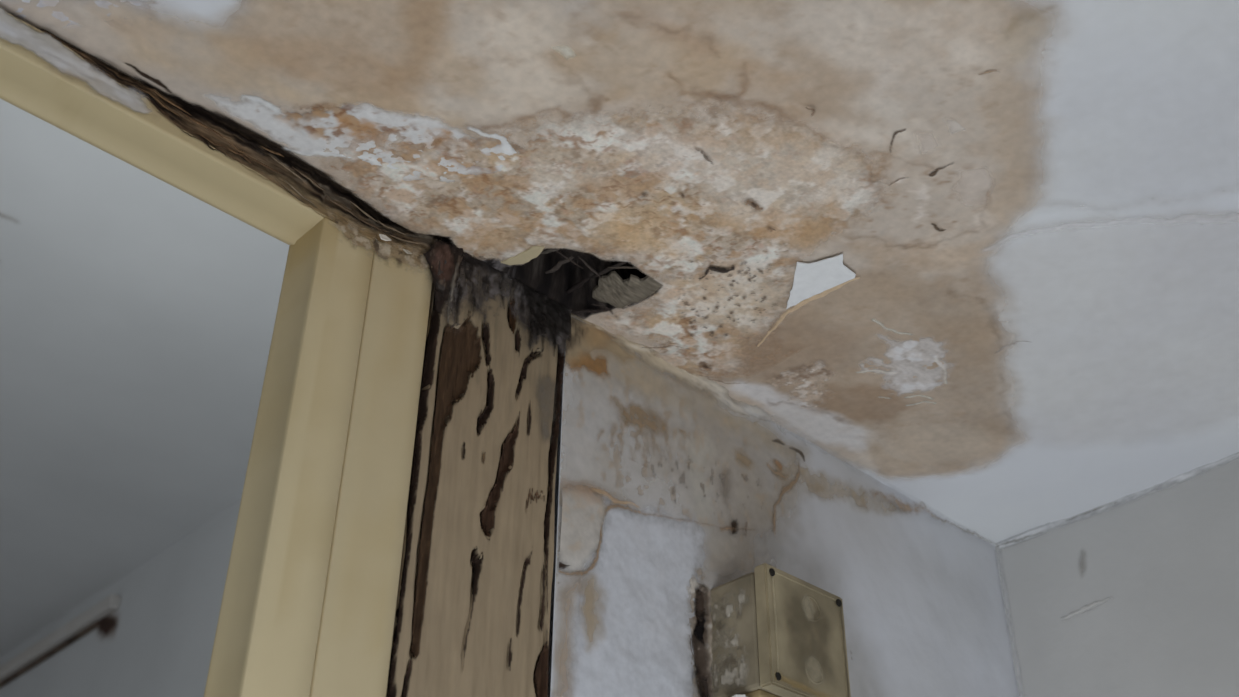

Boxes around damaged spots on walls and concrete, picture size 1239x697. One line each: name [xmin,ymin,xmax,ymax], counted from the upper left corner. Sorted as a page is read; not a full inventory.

water stain [0,0,1052,570]
spalling [210,96,885,402]